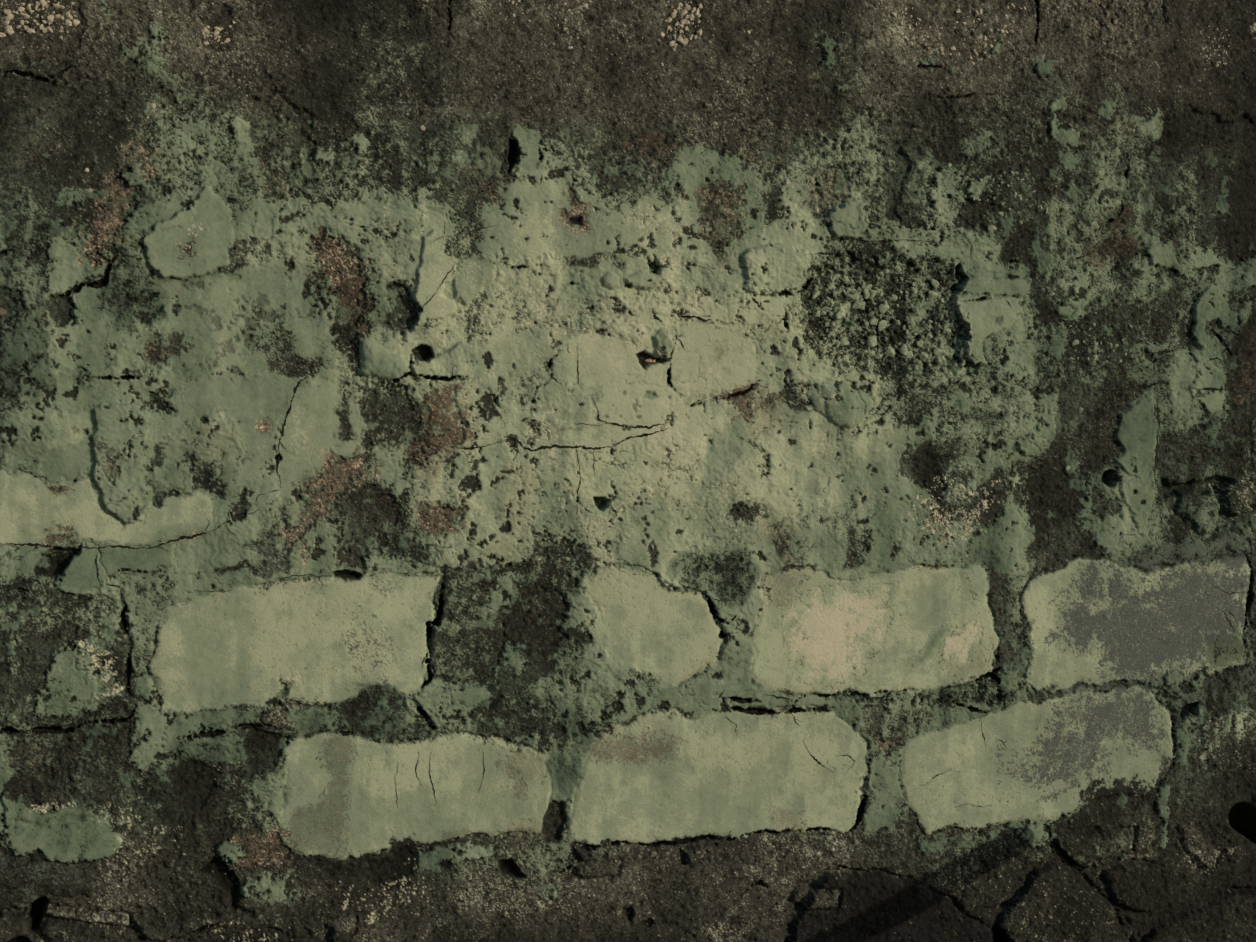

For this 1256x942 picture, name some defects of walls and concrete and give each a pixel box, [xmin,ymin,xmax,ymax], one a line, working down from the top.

crack [1034,0,1043,51]
flaking render [1135,104,1256,279]
peeling [381,230,499,344]
spalling [743,199,1032,385]
crack [84,368,154,380]
peeling [86,385,252,527]
peeling [352,318,764,451]
crack [444,308,761,515]
crack [0,371,319,735]
crack [173,719,285,740]
leakage [239,932,279,942]
leakage [371,875,421,918]